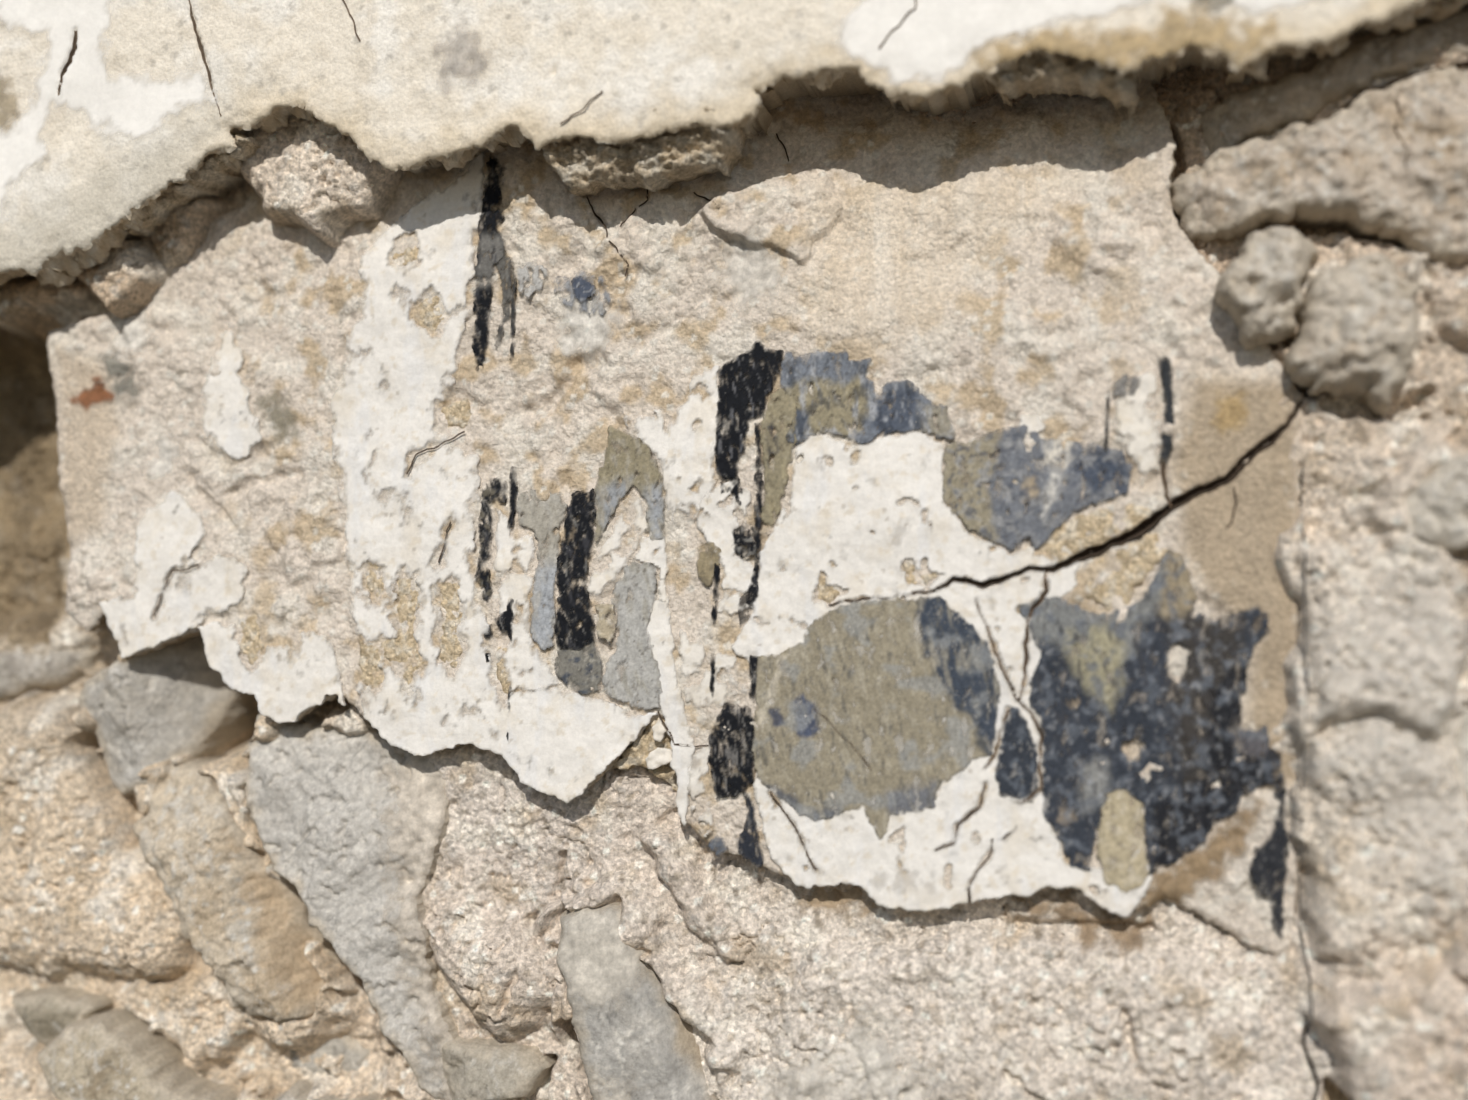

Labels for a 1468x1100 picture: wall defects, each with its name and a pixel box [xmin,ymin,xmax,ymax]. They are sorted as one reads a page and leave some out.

crack [58,31,77,96]
crack [188,0,222,116]
crack [879,0,917,49]
spalling [127,133,261,239]
spalling [542,106,753,198]
peeling [99,152,1290,938]
crack [828,400,1303,902]
crack [1298,467,1319,1100]